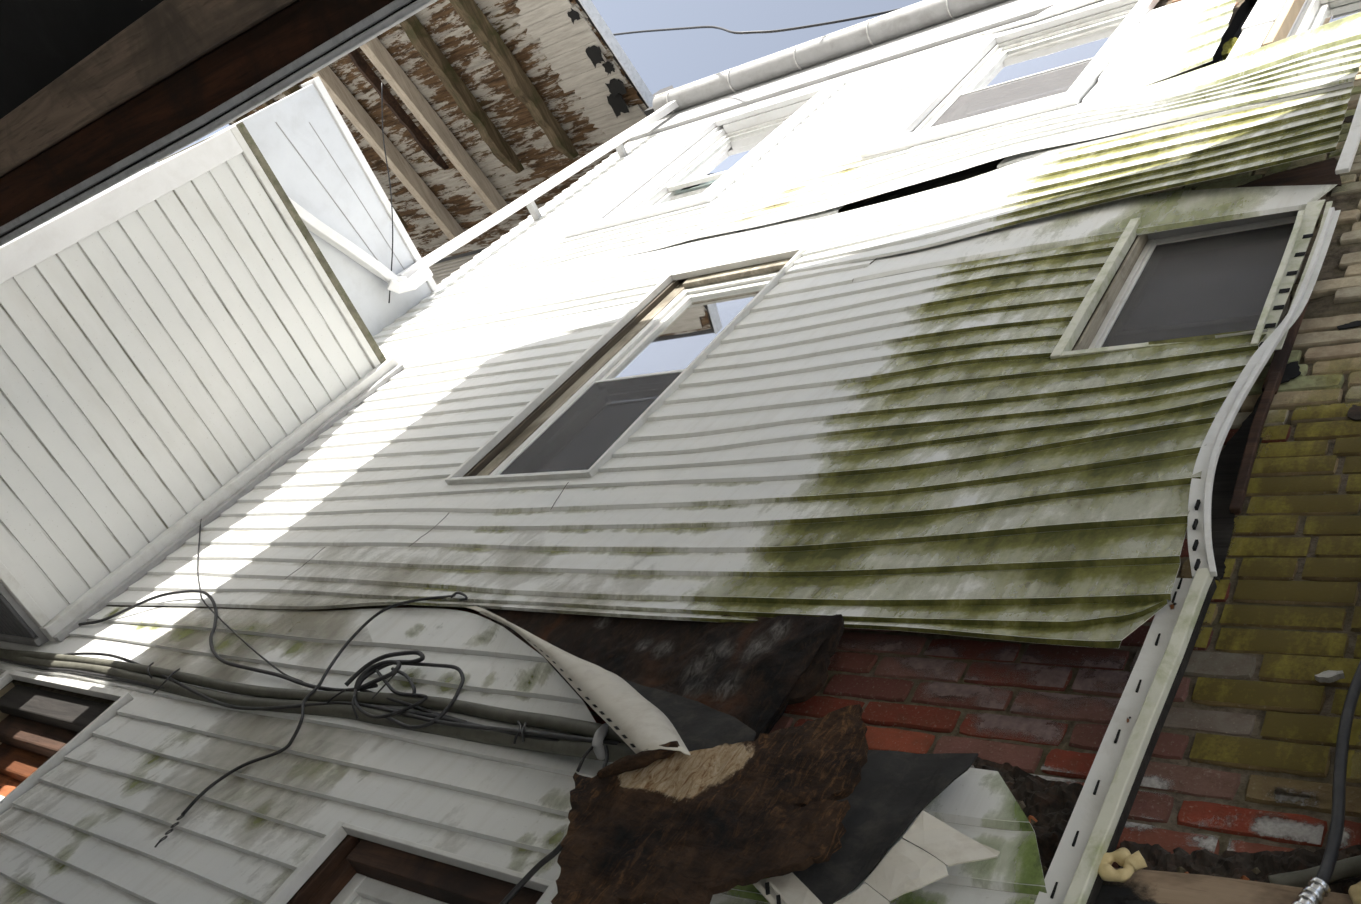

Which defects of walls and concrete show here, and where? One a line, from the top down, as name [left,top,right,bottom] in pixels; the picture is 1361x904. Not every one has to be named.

leakage [681,0,1361,648]
leakage [664,505,731,532]
leakage [367,567,480,606]
leakage [136,604,343,681]
leakage [128,755,160,790]
peeling [1031,766,1075,783]